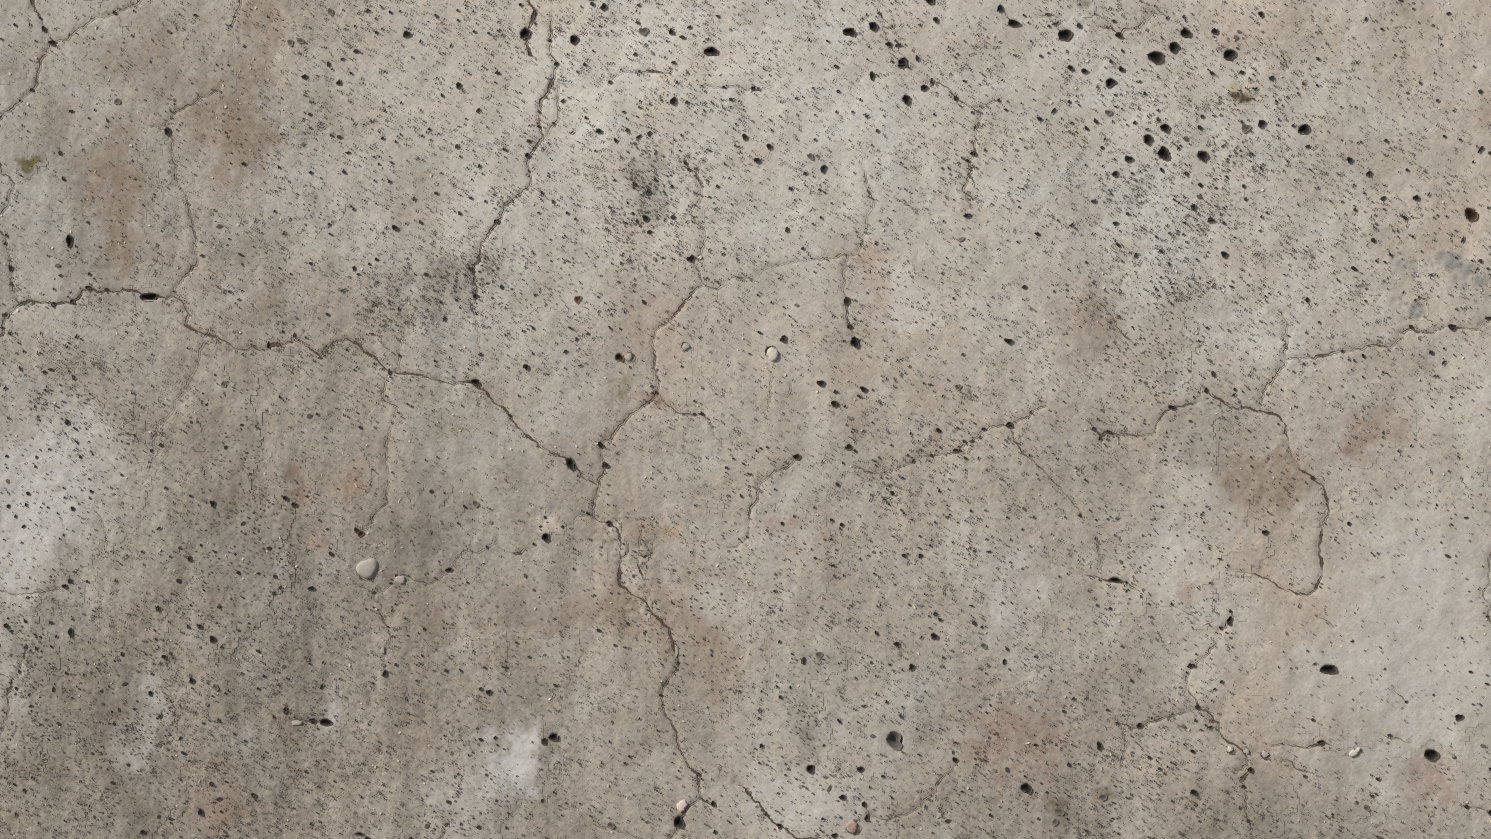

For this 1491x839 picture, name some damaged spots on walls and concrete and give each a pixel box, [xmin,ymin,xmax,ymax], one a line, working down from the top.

crack [1098,12,1167,35]
crack [926,82,996,199]
crack [0,0,874,839]
crack [854,389,1133,587]
crack [1095,312,1491,627]
crack [871,766,953,820]
crack [1120,606,1330,839]